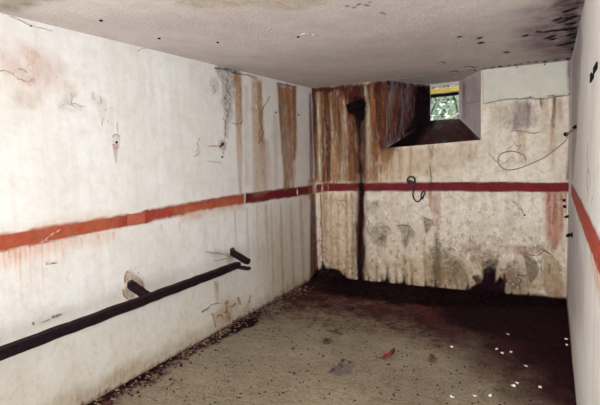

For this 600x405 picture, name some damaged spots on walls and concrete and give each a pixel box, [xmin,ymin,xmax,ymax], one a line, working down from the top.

water stain [523,0,584,94]
corrosion [233,75,242,125]
corrosion [277,83,297,188]